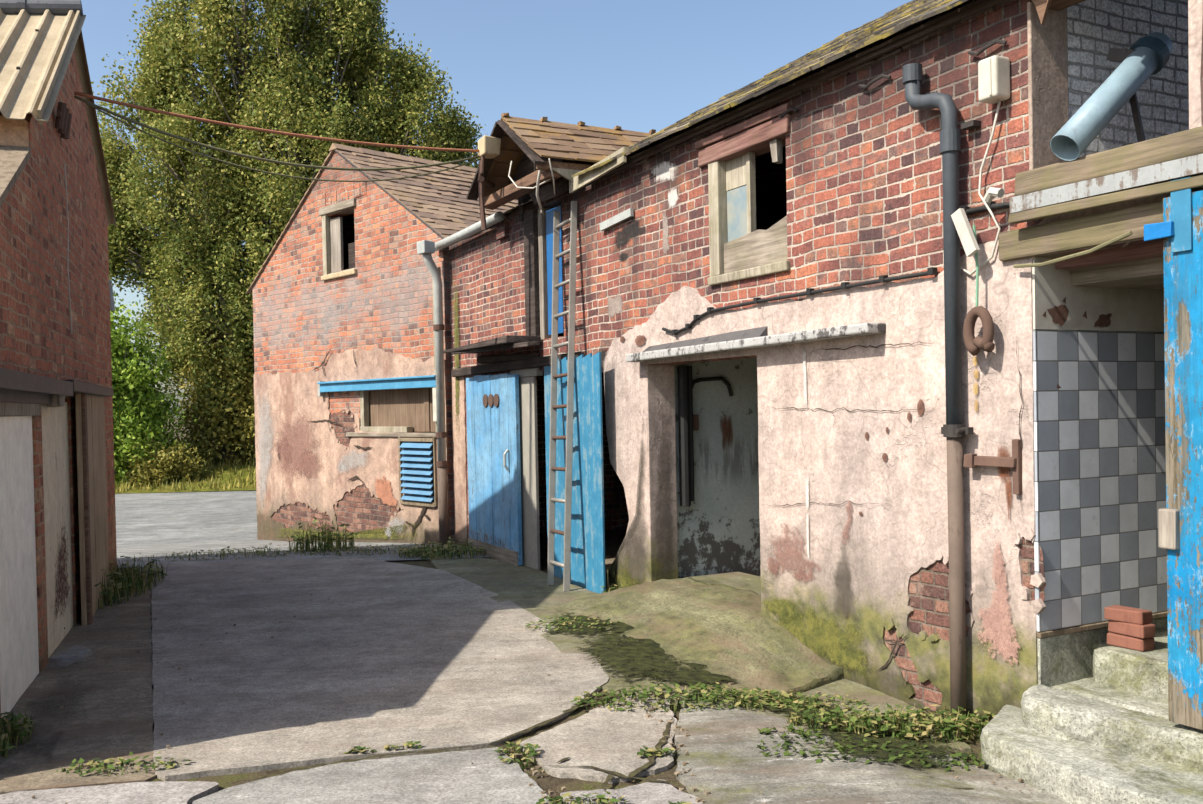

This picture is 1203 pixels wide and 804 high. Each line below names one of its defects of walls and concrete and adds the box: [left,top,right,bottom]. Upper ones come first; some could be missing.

spalling [330,407,357,449]
spalling [271,476,401,539]
leakage [818,643,867,673]
spalling [881,549,950,715]
flaking render [965,525,1046,665]
crack [227,689,676,789]